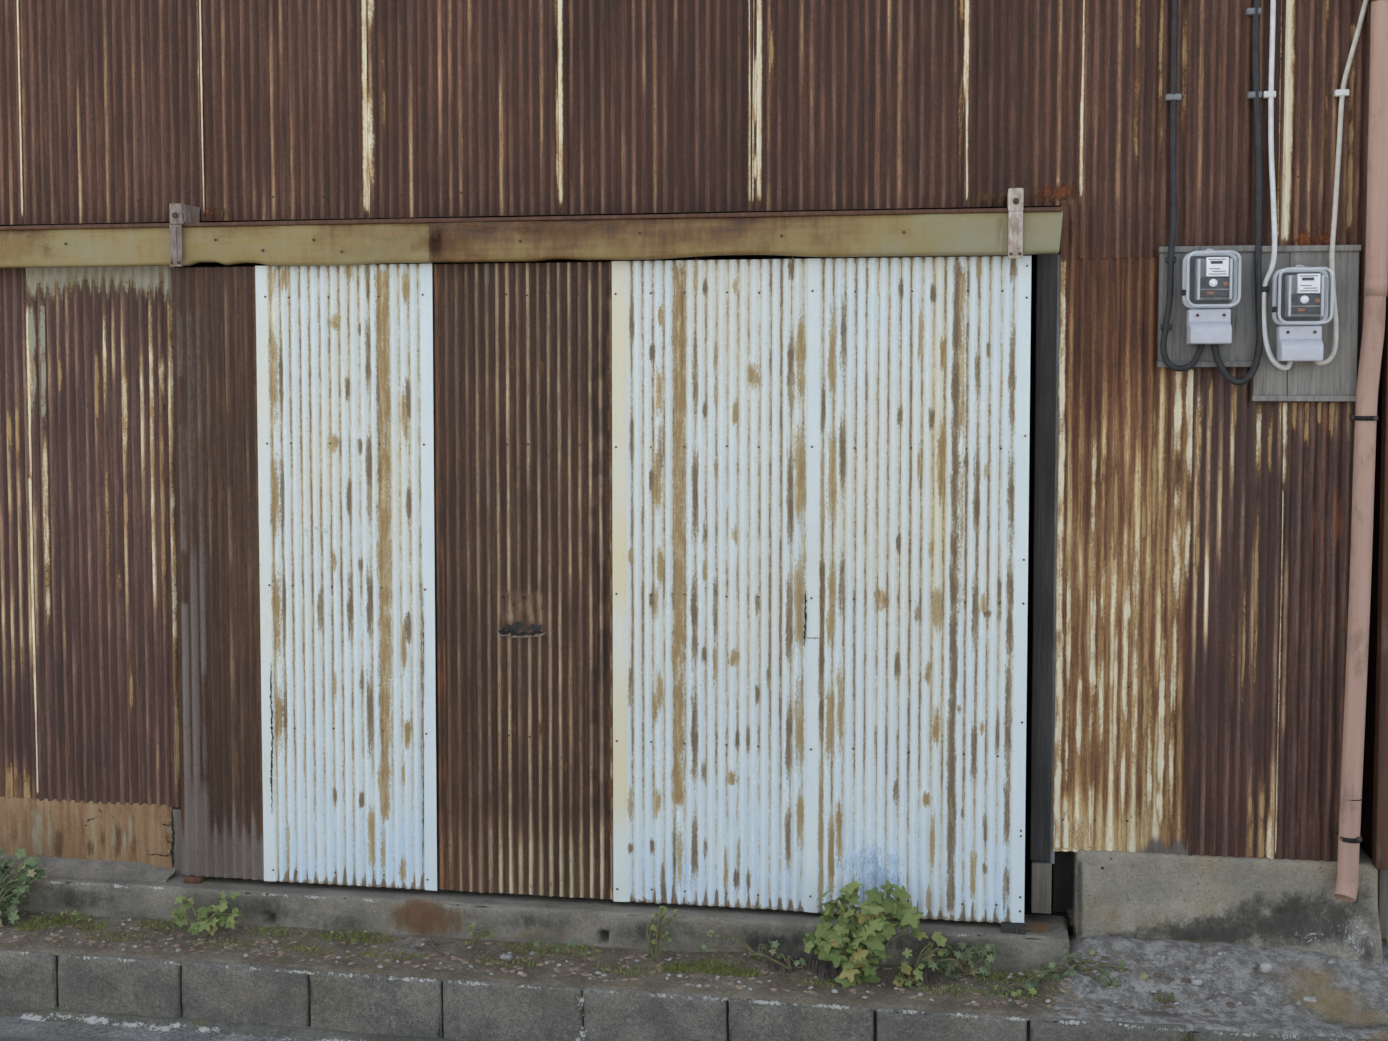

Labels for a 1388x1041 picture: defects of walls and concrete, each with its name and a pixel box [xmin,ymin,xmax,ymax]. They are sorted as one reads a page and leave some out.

rust [253,267,289,315]
rust [253,332,283,423]
rust [255,430,284,557]
rust [257,572,286,650]
rust [282,264,460,935]
rust [630,261,847,914]
rust [915,257,1050,931]
rust [258,670,287,746]
rust [608,666,633,706]
rust [0,762,31,799]
rust [608,779,632,821]
damp [1108,895,1373,946]